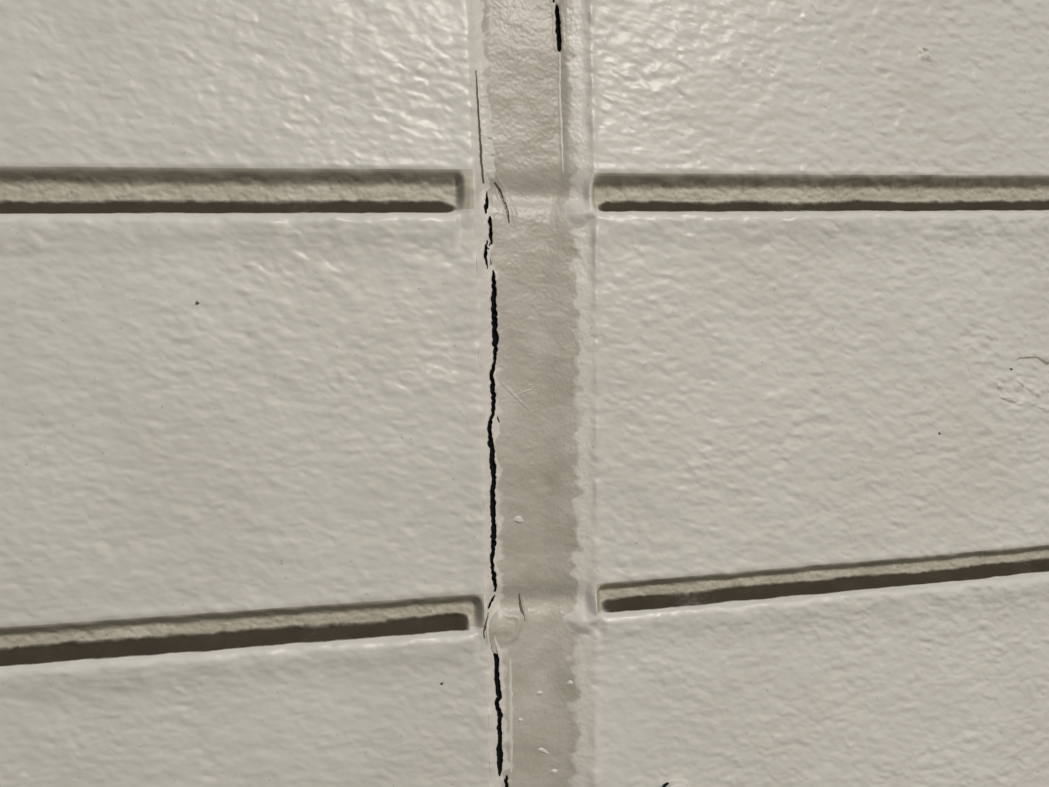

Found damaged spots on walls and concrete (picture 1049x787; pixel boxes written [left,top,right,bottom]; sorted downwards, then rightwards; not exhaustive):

crack [553,0,562,51]
crack [475,70,508,787]